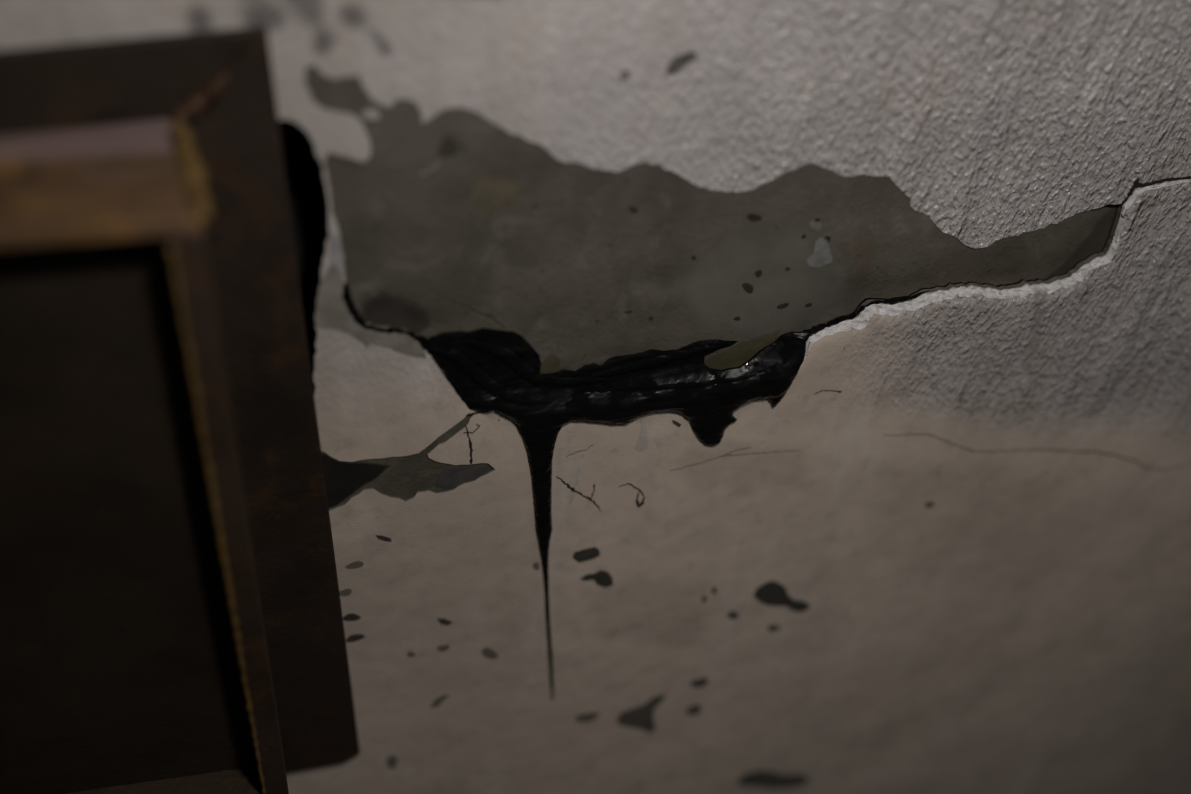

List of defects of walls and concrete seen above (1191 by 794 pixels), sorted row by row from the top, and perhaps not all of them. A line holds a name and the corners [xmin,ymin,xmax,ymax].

peeling [666,52,698,75]
spalling [305,65,1118,374]
crack [1121,176,1191,205]
peeling [321,413,494,509]
leakage [342,283,930,700]